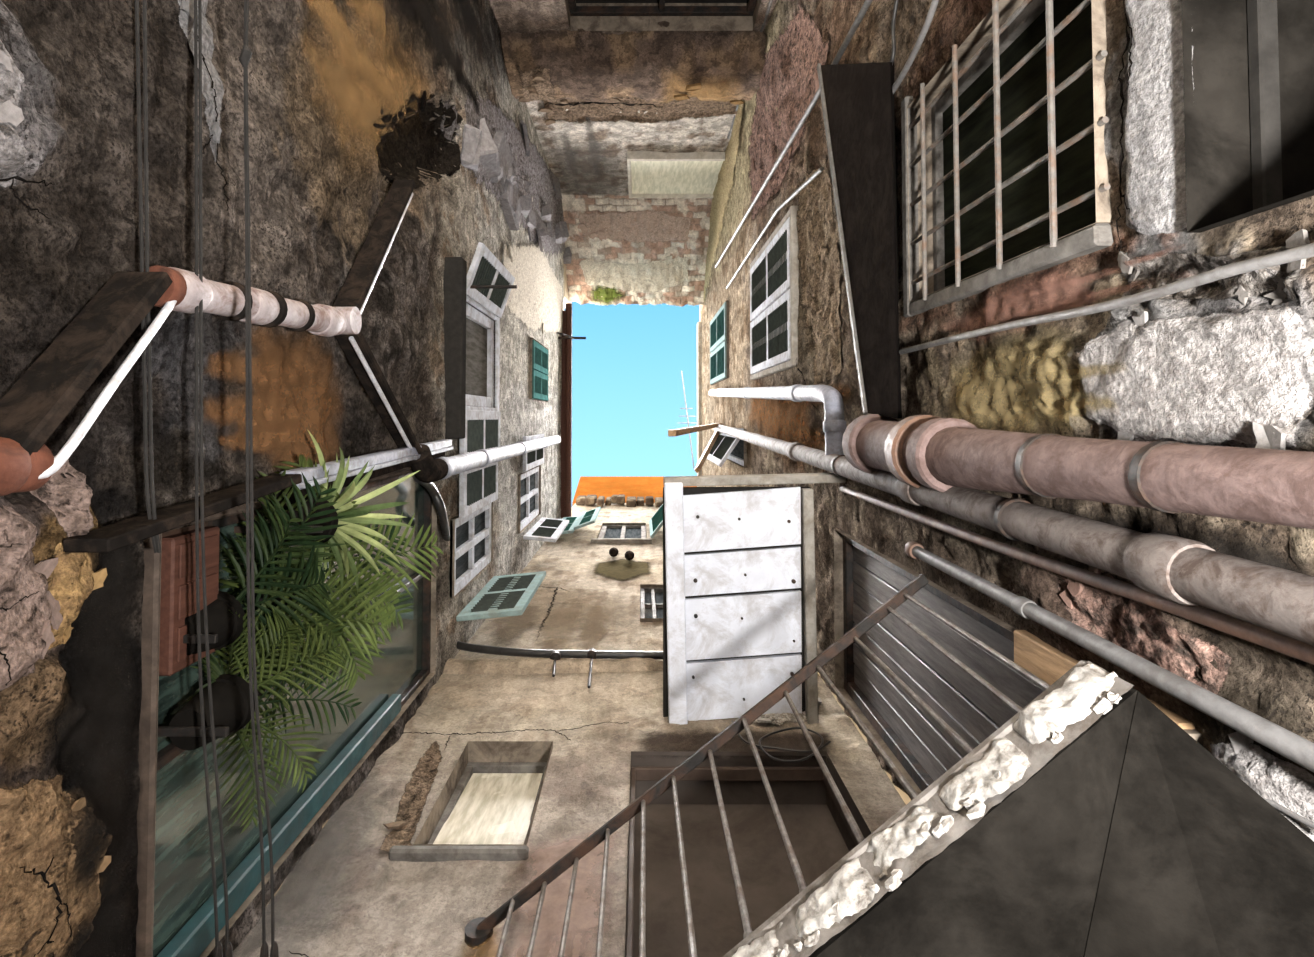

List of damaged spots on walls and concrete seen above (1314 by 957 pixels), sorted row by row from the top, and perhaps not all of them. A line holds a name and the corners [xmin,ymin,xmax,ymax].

leakage [385,0,508,113]
crack [0,176,53,219]
flaking render [373,91,691,334]
flaking render [516,1,842,385]
flaking render [1076,229,1314,450]
crack [0,652,12,686]
flaking render [0,505,107,691]
leakage [594,559,651,580]
flaking render [0,774,111,957]
flaking render [379,741,442,853]
rust [467,931,497,957]
flaking render [732,663,1122,957]